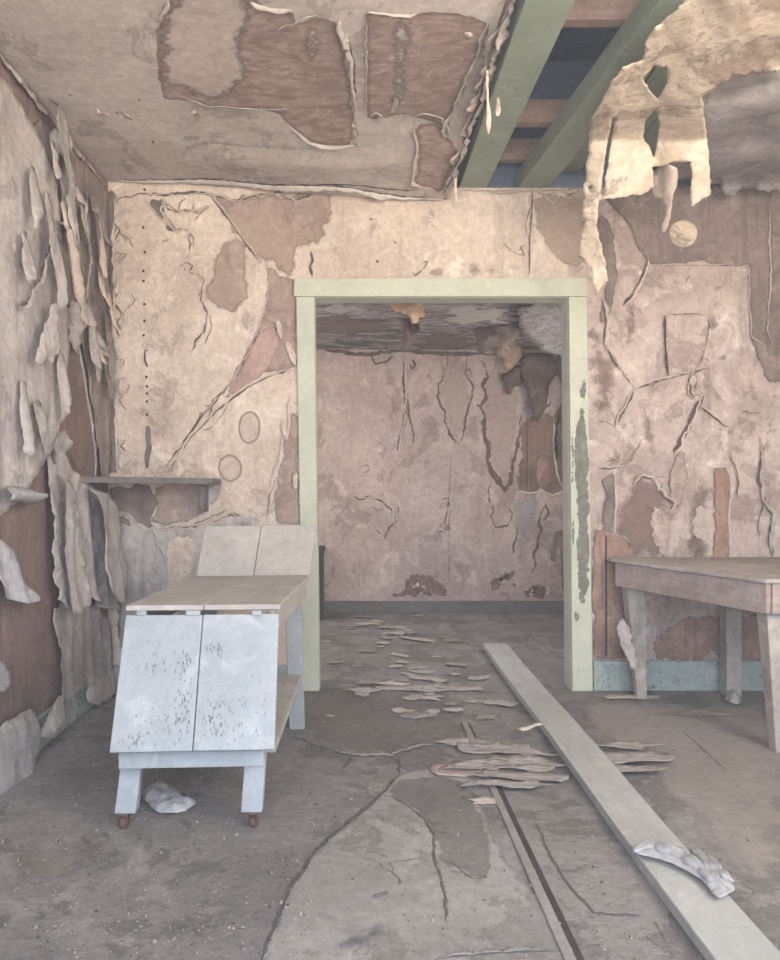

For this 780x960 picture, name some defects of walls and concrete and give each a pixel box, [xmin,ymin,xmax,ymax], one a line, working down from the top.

crack [74,178,442,471]
peeling [276,320,296,366]
crack [352,464,400,539]
crack [318,349,494,451]
crack [438,458,451,532]
peeling [550,380,590,621]
crack [600,260,777,557]
crack [260,721,477,960]
crack [439,785,664,960]